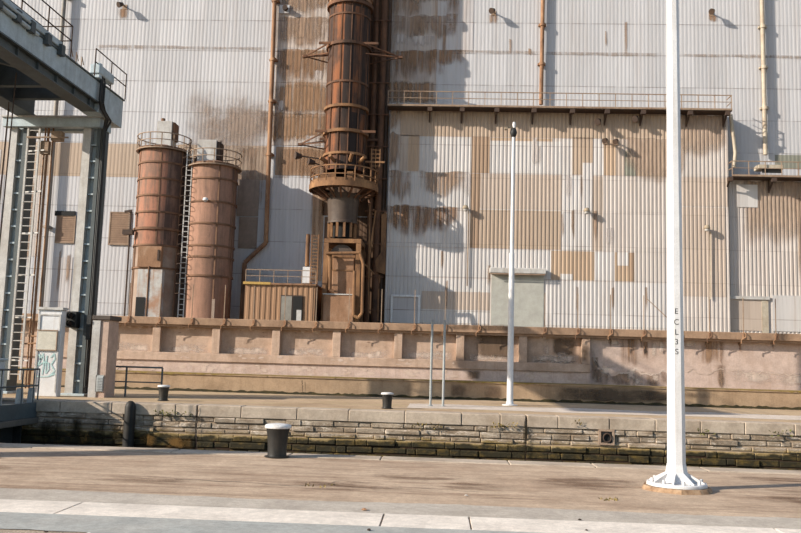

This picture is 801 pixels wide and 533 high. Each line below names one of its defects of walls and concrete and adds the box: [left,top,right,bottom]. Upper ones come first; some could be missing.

corrosion [389,0,462,232]
corrosion [57,251,70,285]